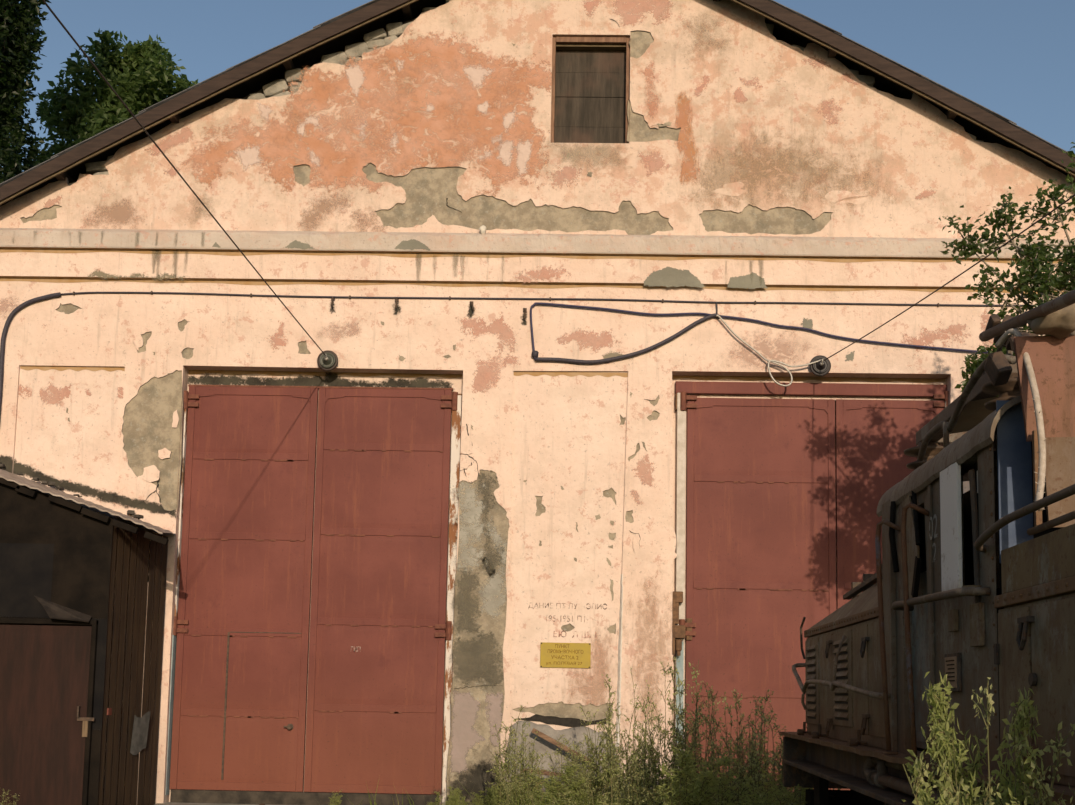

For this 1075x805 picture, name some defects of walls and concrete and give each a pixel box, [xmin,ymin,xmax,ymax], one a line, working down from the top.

spalling [613,0,681,175]
peeling [145,32,673,251]
spalling [20,196,62,223]
spalling [699,195,873,235]
spalling [644,267,706,288]
spalling [727,272,768,289]
peeling [443,312,517,393]
spalling [118,347,194,511]
leakage [0,455,178,518]
peeling [628,442,657,486]
spalling [595,500,640,566]
spalling [446,470,614,801]